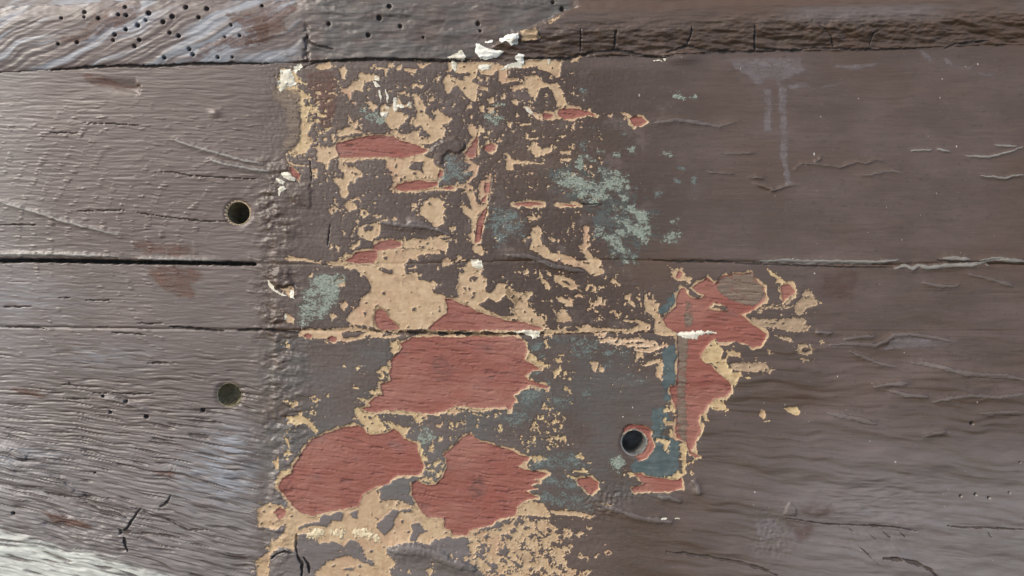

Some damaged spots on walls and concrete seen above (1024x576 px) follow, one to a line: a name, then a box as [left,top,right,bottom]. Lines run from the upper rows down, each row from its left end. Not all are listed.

crack [45,492,209,552]
peeling [251,15,825,576]